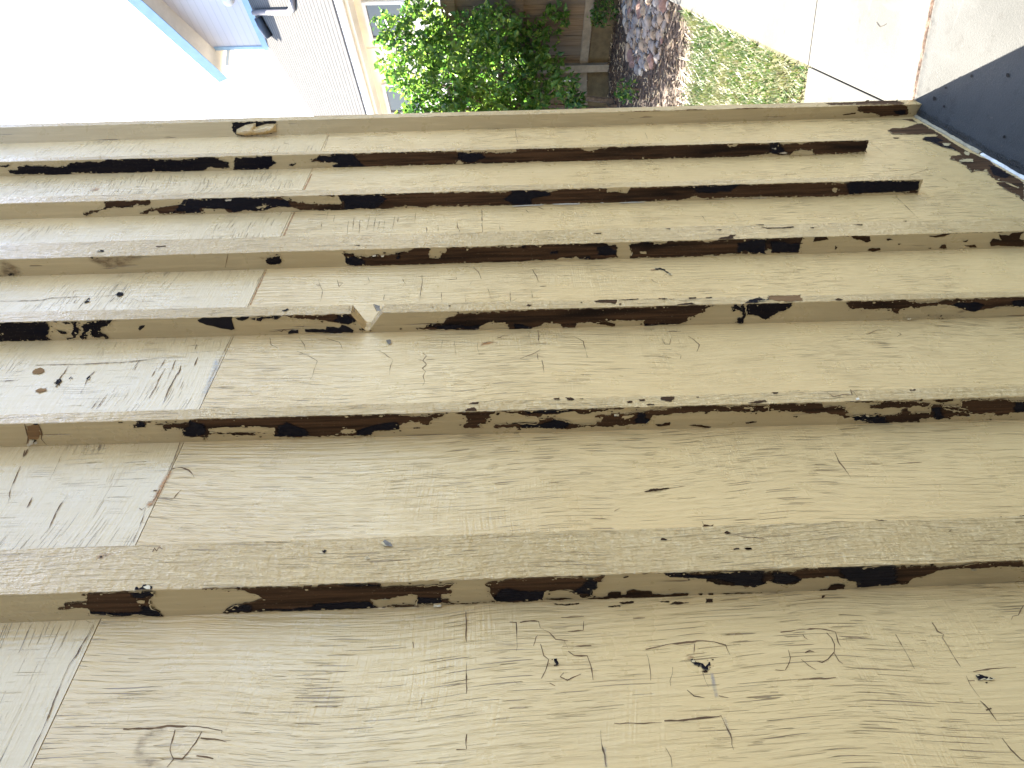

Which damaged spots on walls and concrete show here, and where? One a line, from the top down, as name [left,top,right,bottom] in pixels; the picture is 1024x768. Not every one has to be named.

peeling [0,156,276,175]
peeling [311,140,868,168]
peeling [82,180,920,216]
peeling [342,224,837,270]
peeling [416,297,715,331]
peeling [118,389,1024,440]
peeling [203,561,1024,614]
crack [462,613,470,693]
crack [512,616,593,686]
crack [775,628,843,679]
crack [601,640,734,765]
crack [932,623,1024,761]